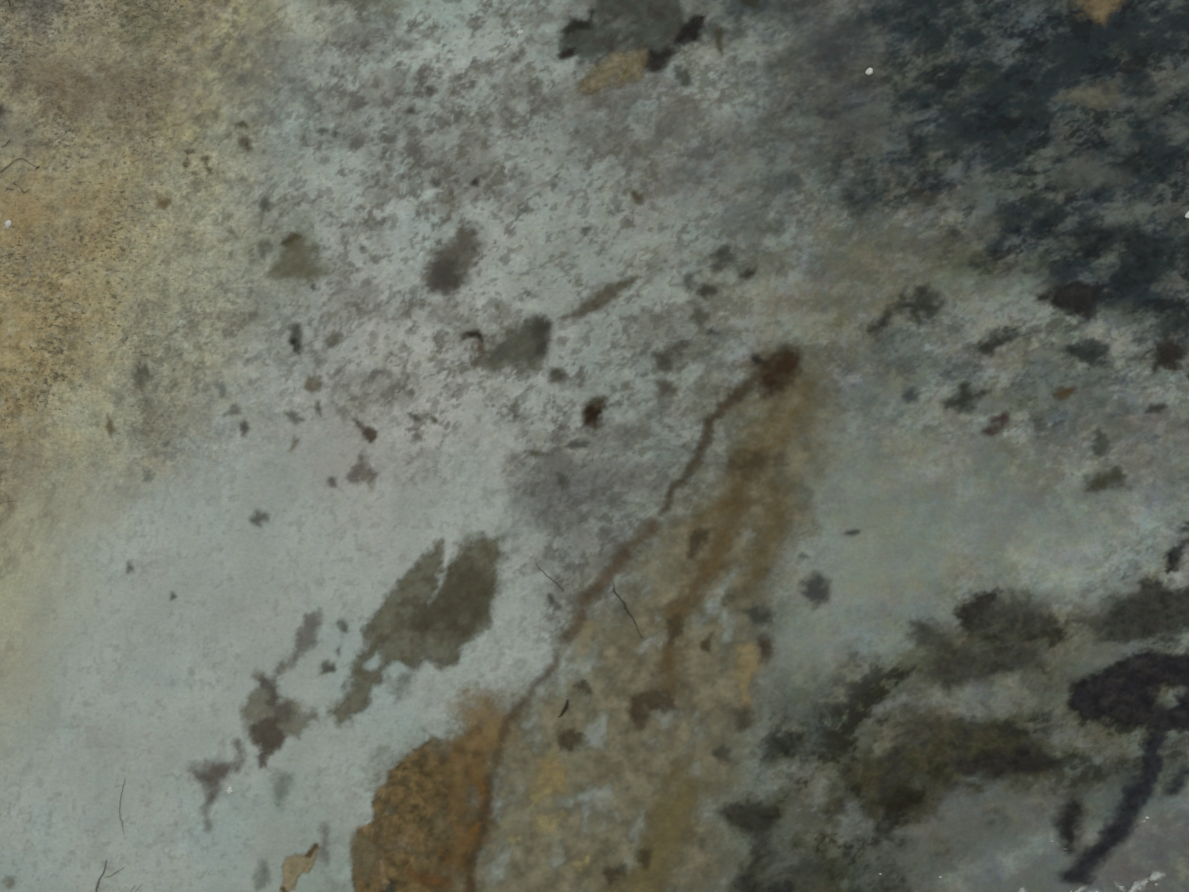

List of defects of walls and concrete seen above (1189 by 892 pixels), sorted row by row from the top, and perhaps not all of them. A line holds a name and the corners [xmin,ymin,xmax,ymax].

leakage [236,613,320,767]
leakage [332,538,501,723]
rust [431,350,824,892]
mould [1056,522,1189,883]
leakage [196,764,238,825]
peeling [281,828,326,892]
peeling [352,737,451,892]